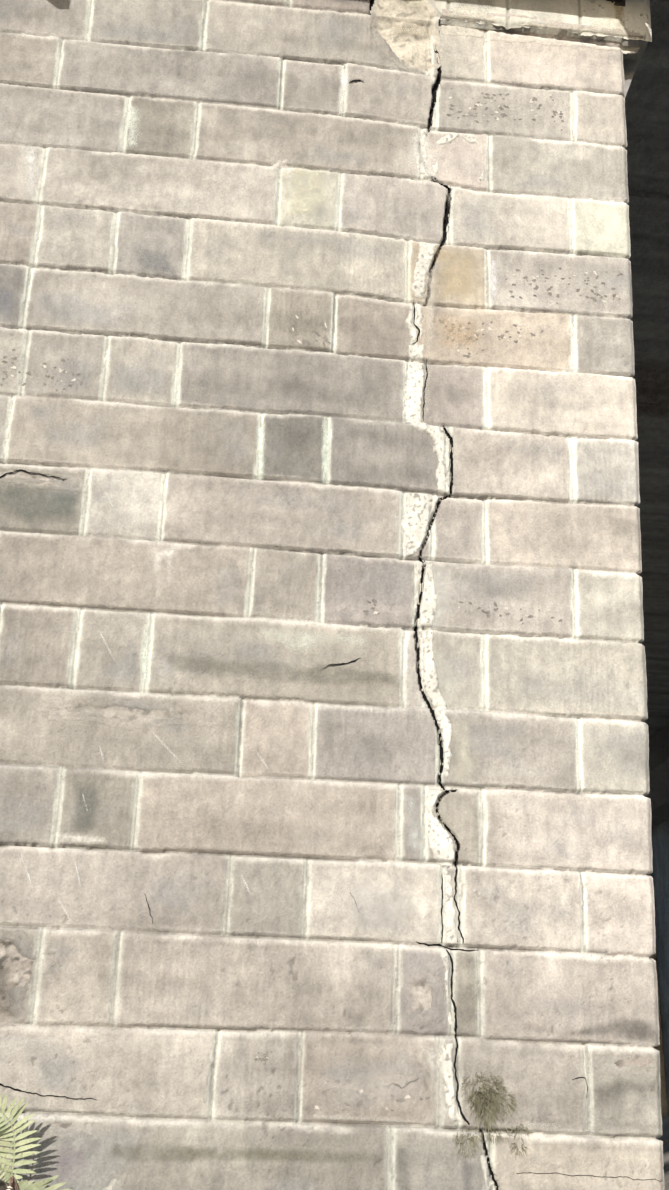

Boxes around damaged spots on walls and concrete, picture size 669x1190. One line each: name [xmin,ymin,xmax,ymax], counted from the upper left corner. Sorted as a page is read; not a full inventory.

spalling [370,0,644,78]
crack [0,469,67,480]
crack [413,37,658,1190]
crack [323,658,359,669]
crack [0,1083,96,1100]